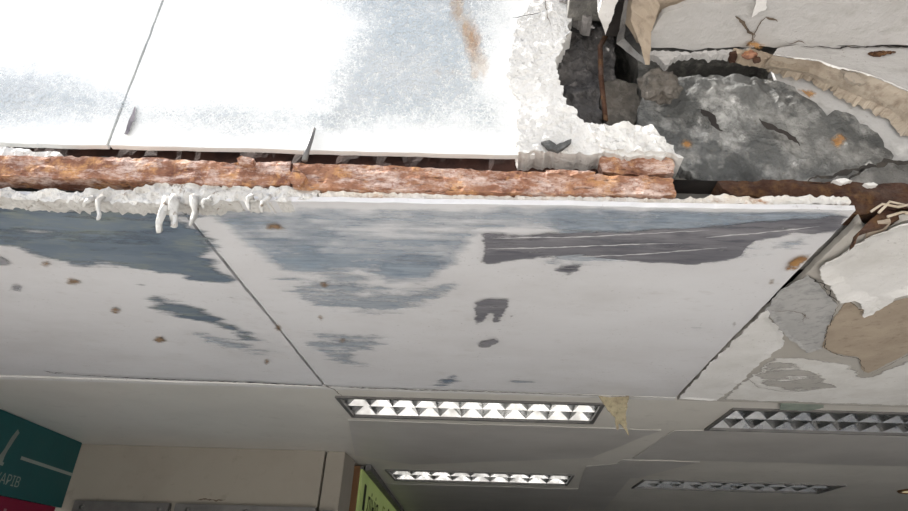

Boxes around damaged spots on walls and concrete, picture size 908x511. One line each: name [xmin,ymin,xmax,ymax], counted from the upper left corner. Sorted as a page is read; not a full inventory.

crack [735,16,777,46]
crack [792,41,908,49]
spalling [557,0,908,184]
efflorescence [0,146,64,158]
peeling [546,169,596,179]
efflorescence [0,183,851,233]
peeling [244,209,847,314]
peeling [474,299,508,323]
peeling [679,210,908,401]
peeling [307,334,383,365]
peeling [479,339,498,348]